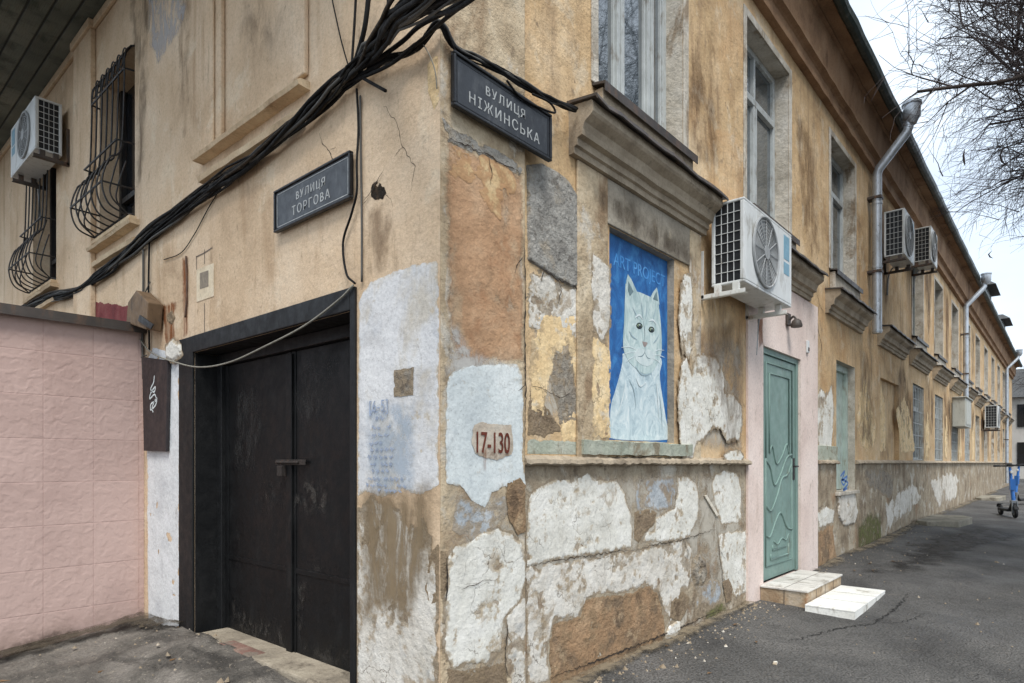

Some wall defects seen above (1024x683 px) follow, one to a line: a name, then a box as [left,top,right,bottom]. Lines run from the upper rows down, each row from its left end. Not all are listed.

hole [371,182,386,200]
peeling [447,143,576,442]
peeling [394,367,414,397]
peeling [677,272,744,466]
peeling [818,385,834,446]
spalling [425,544,448,604]
peeling [531,481,676,570]
peeling [681,479,741,603]
spalling [543,586,690,683]